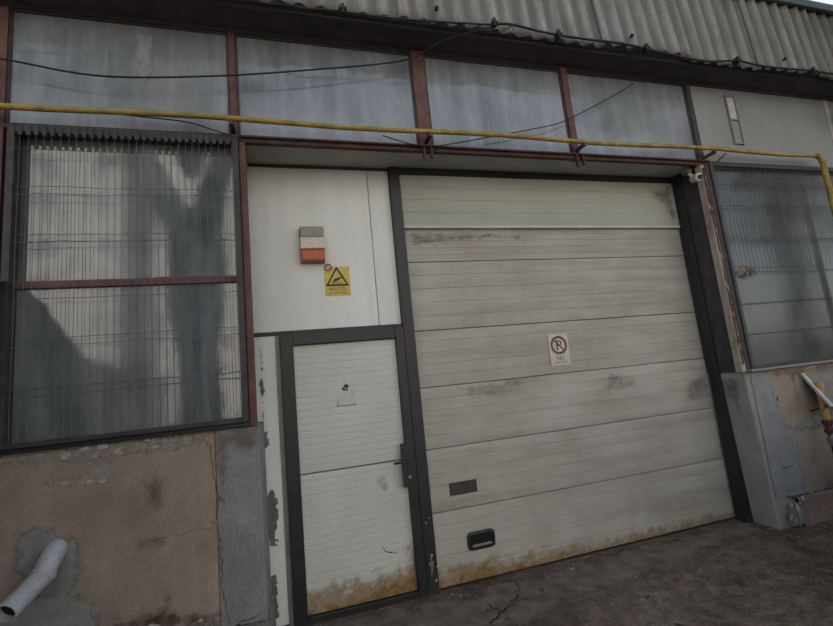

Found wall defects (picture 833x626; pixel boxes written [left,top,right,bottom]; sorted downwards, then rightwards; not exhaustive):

peeling [2,433,205,464]
crack [147,442,262,626]
peeling [267,490,279,547]
peeling [271,574,279,618]
rust [307,563,417,616]
rust [439,546,593,588]